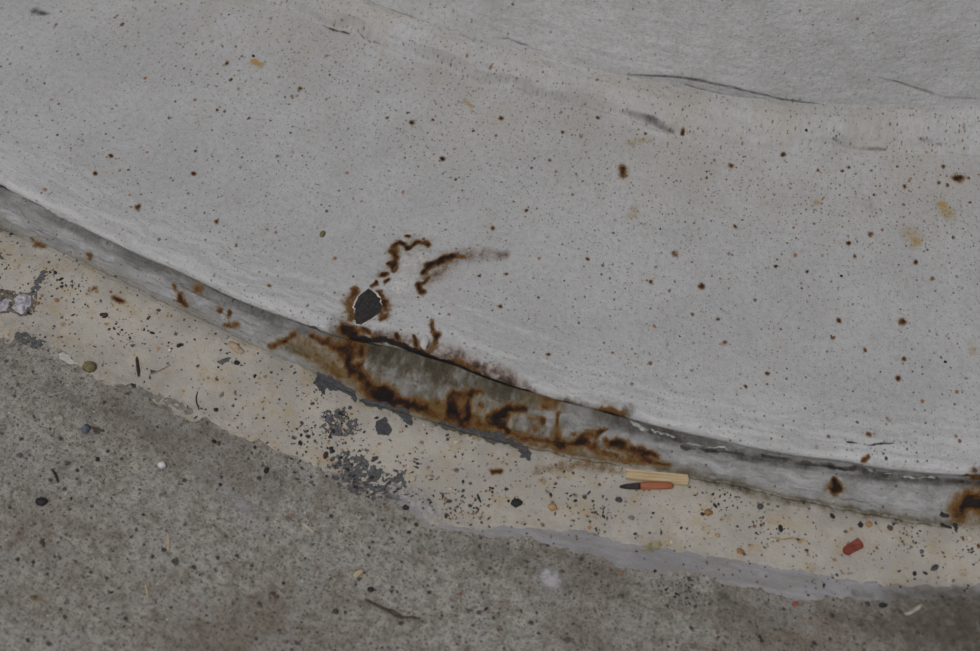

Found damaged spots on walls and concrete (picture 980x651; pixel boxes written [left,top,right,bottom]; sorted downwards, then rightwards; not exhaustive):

spalling [0,270,46,317]
peeling [345,287,391,326]
corrosion [370,234,431,288]
corrosion [415,252,466,295]
corrosion [267,319,671,473]
peeling [313,372,413,502]
corrosion [828,476,843,497]
corrosion [949,467,980,523]